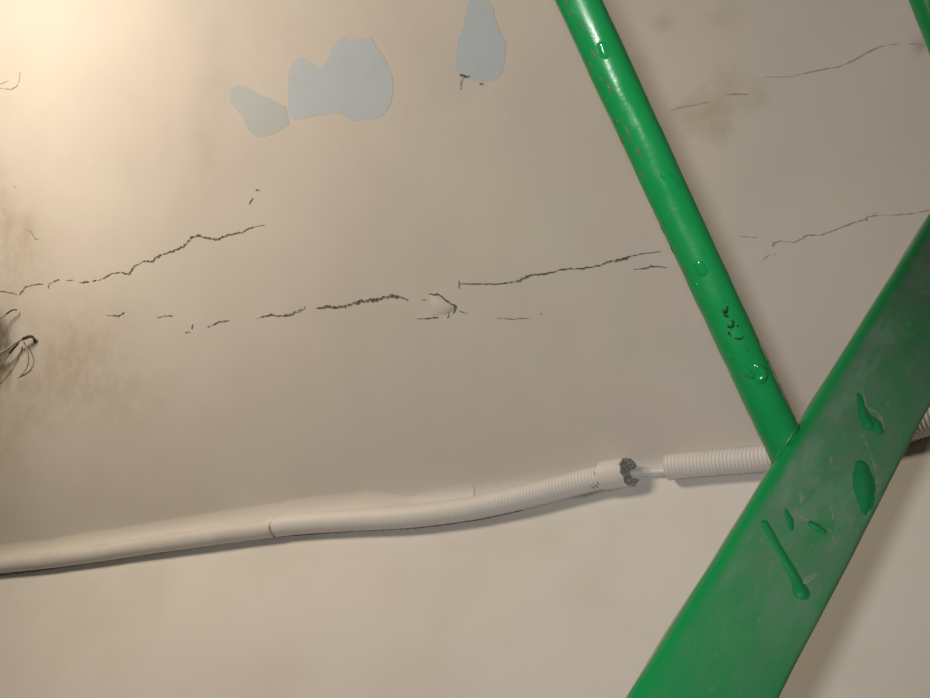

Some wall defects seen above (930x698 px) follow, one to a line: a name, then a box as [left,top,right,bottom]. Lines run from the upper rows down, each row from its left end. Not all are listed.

peeling [229,36,394,137]
peeling [455,0,507,89]
crack [770,43,923,77]
crack [1,225,264,295]
crack [261,251,666,319]
crack [742,210,929,258]